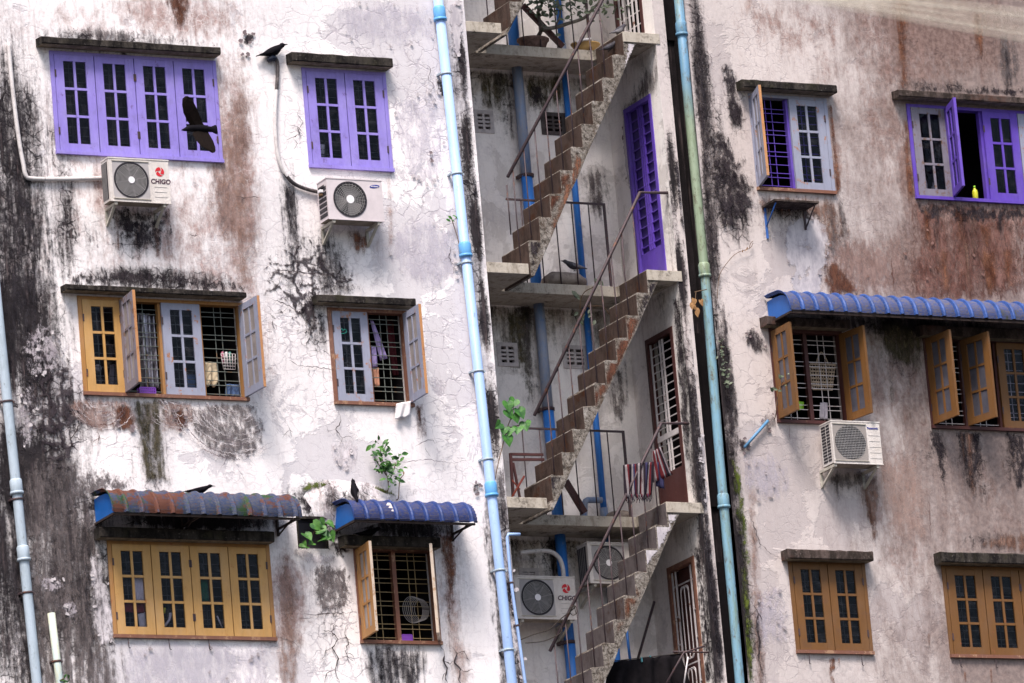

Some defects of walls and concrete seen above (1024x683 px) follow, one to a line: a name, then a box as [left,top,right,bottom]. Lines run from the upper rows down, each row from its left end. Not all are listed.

rust [893,0,911,86]
water stain [525,76,561,109]
water stain [459,46,483,261]
water stain [692,1,770,284]
water stain [780,196,849,254]
crack [269,270,325,329]
water stain [265,185,353,349]
rust [824,263,855,294]
water stain [0,48,274,683]
water stain [930,430,946,480]
water stain [1006,432,1024,490]
crack [304,612,353,683]